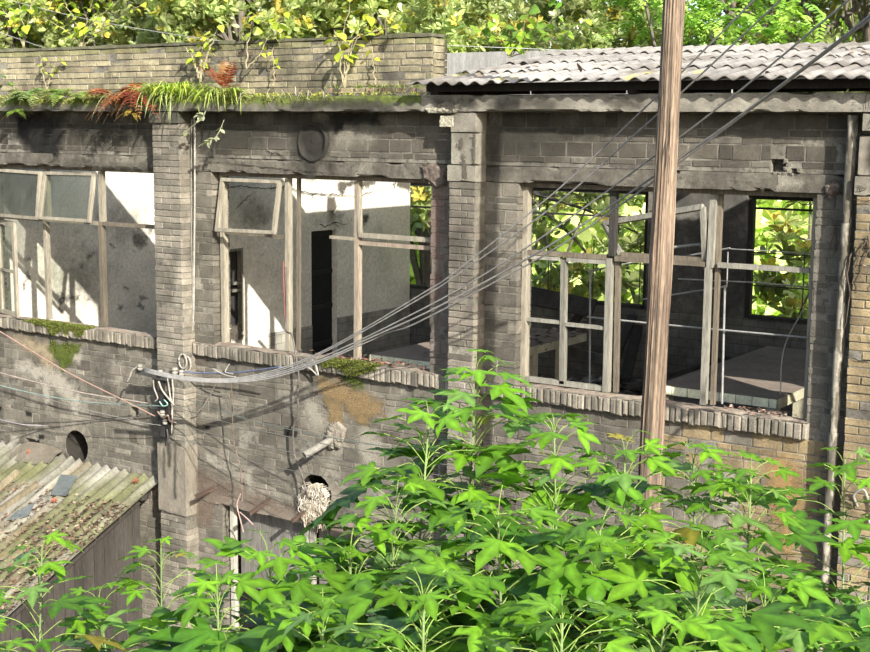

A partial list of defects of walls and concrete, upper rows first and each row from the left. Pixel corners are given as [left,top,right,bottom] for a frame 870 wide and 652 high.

damp [17,117,57,155]
crack [203,150,388,208]
spalling [421,163,447,189]
damp [15,338,81,414]